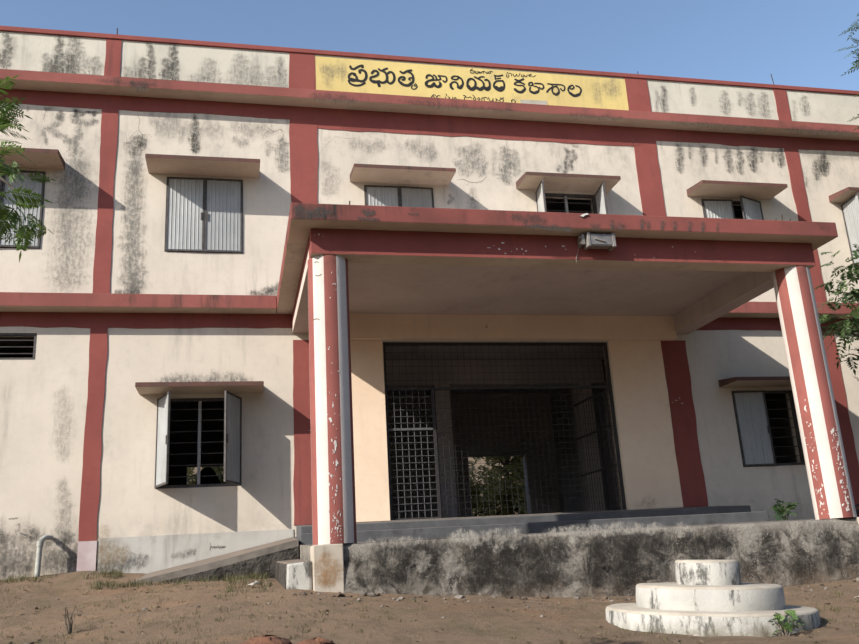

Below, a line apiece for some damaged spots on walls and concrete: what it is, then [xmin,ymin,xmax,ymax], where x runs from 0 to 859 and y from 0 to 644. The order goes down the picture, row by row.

damp [44,37,79,73]
damp [131,45,179,90]
damp [41,111,96,154]
damp [727,148,758,173]
damp [115,138,144,294]
peeling [326,392,342,540]
peeling [831,428,850,511]
damp [369,522,668,590]
damp [678,521,729,560]